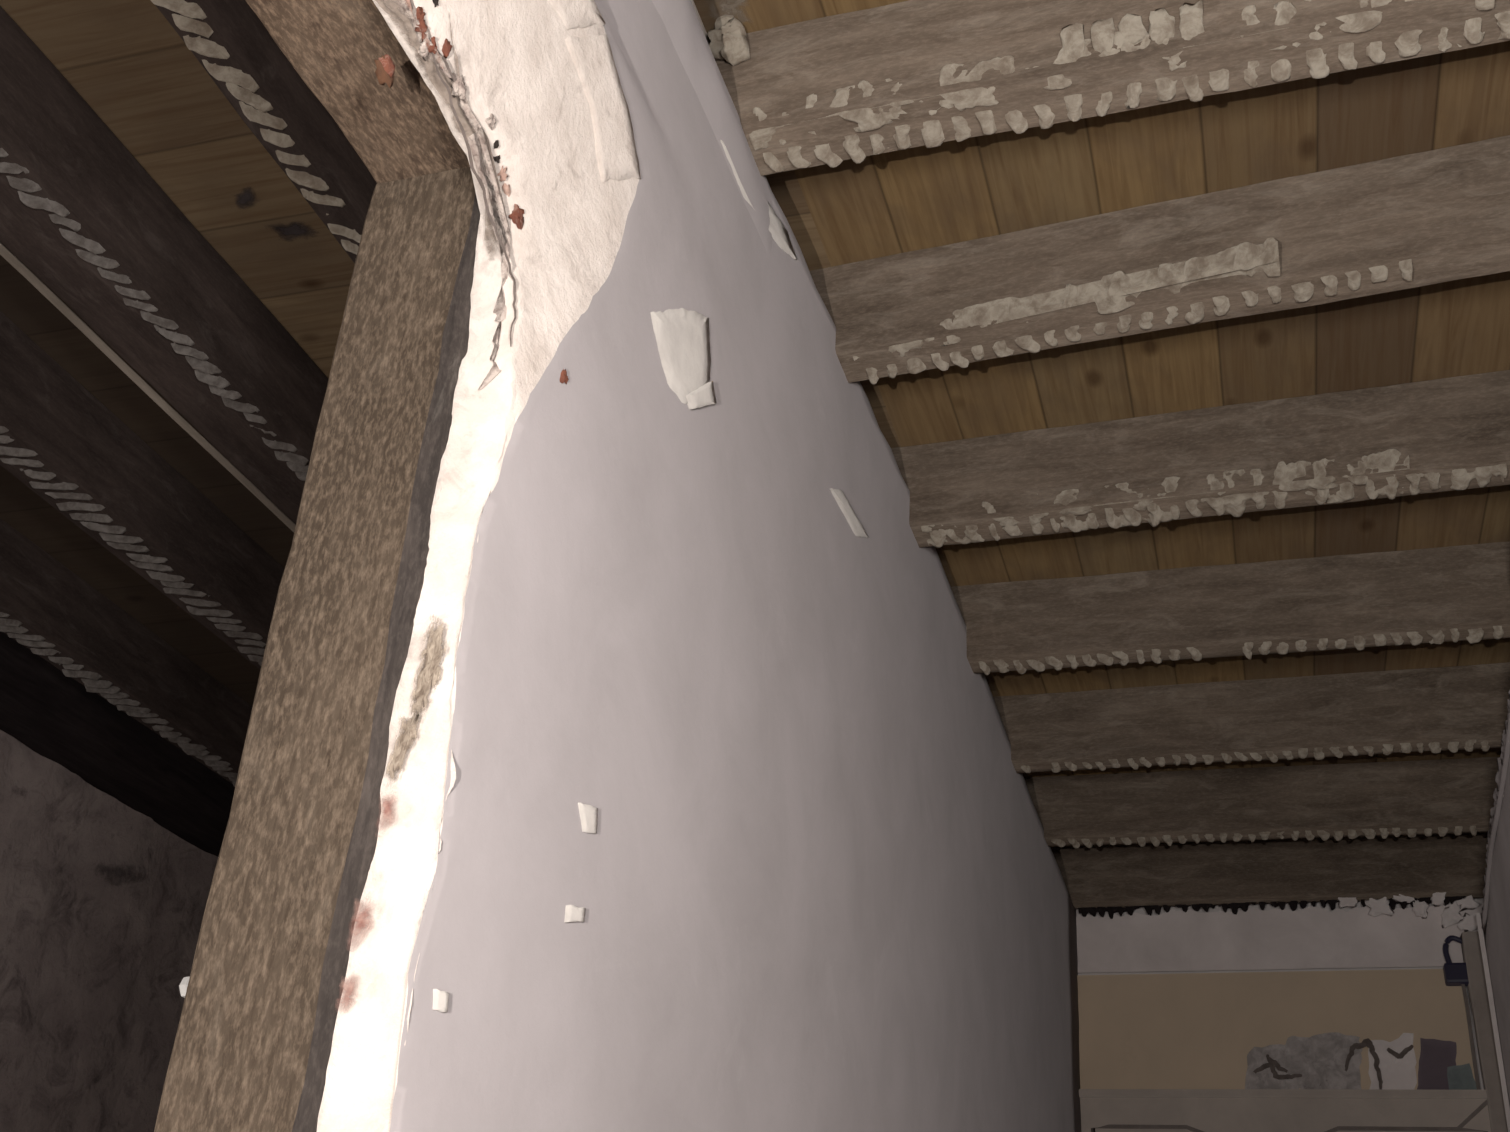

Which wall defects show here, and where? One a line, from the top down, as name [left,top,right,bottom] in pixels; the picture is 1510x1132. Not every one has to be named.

flaking render [374,54,395,88]
peeling [548,0,641,182]
spalling [383,0,525,390]
peeling [650,308,717,410]